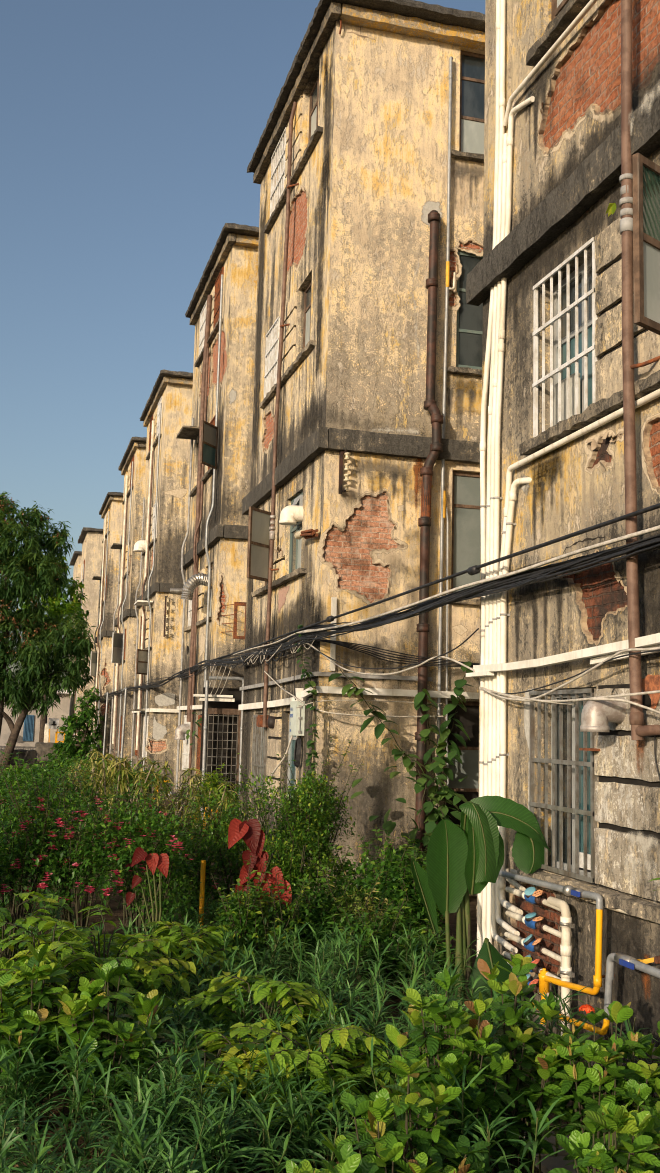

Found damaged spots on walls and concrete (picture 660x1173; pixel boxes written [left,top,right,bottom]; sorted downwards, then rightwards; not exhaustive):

flaking render [537,0,660,157]
damp [316,55,333,375]
flaking render [445,238,483,311]
rust [413,458,423,506]
flaking render [584,426,624,475]
flaking render [639,413,660,496]
damp [162,527,185,583]
flaking render [317,476,408,607]
damp [339,644,405,686]
damp [515,574,565,683]
flaking render [557,549,627,647]
damp [630,835,653,851]